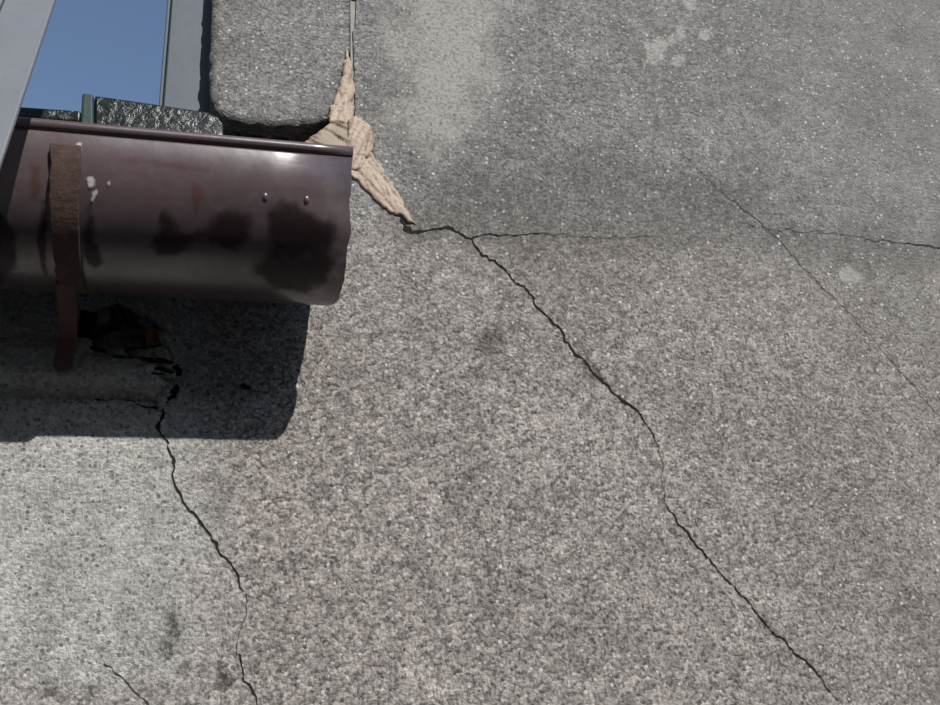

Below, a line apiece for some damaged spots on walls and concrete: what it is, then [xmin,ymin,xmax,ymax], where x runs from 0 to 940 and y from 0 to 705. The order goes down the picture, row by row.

spalling [77,299,183,411]
crack [68,391,258,705]
crack [400,216,843,704]
crack [680,150,940,416]